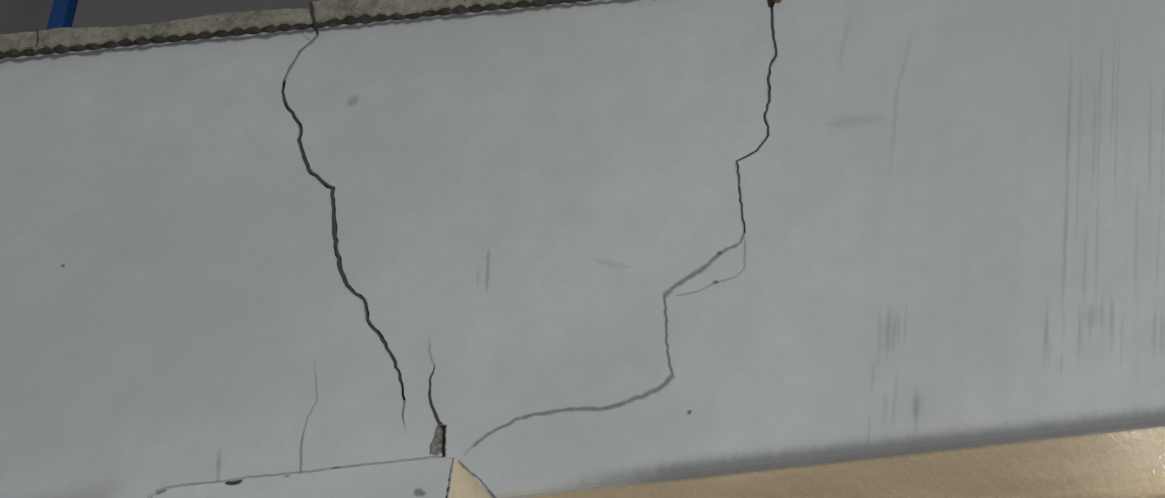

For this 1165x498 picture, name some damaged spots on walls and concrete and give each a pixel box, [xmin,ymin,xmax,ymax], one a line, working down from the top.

crack [309,1,319,35]
crack [736,5,777,233]
crack [282,80,496,498]